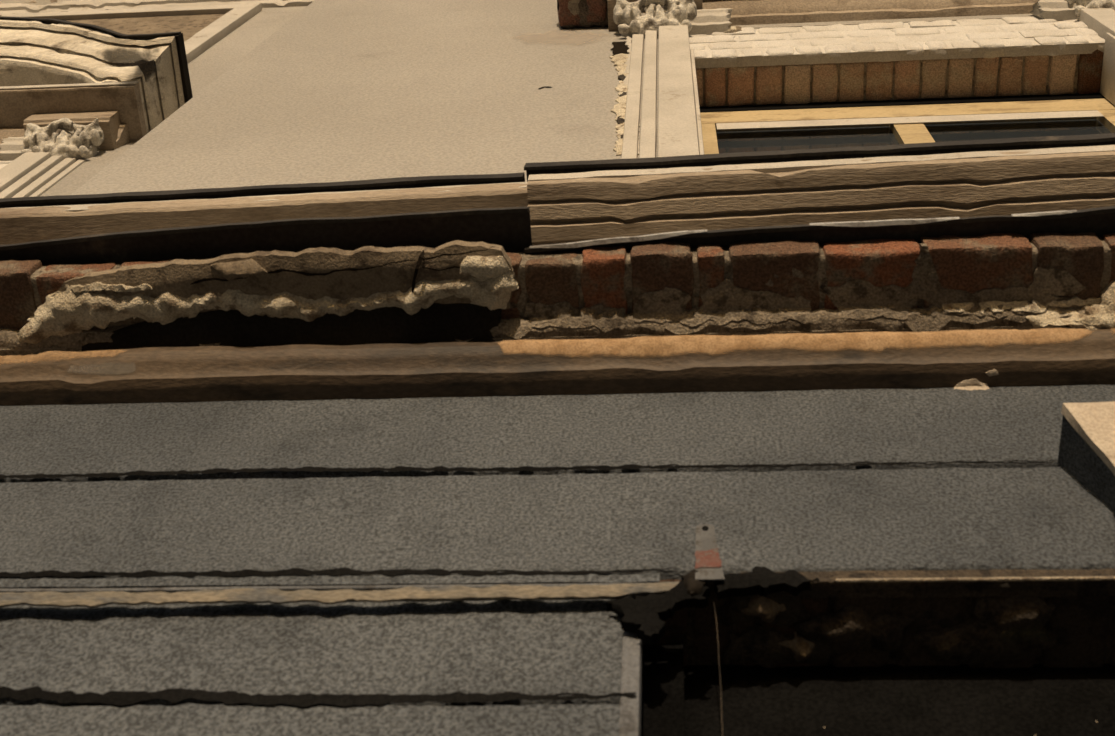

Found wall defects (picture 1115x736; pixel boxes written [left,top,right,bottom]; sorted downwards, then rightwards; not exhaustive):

crack [191,246,497,292]
flaking render [0,240,1115,364]